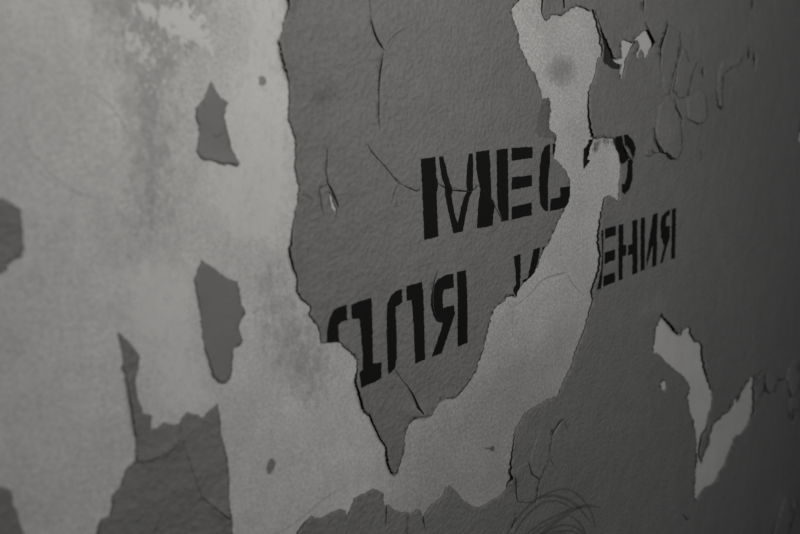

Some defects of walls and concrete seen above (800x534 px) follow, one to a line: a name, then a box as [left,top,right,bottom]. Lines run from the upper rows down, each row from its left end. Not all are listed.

crack [371,20,384,101]
peeling [613,30,651,79]
crack [320,162,338,217]
peeling [0,0,633,534]
peeling [653,318,753,498]